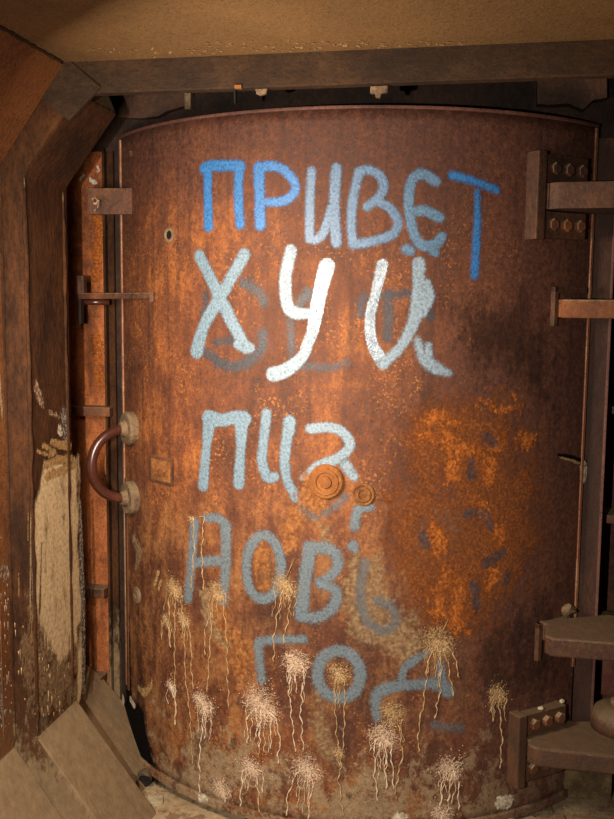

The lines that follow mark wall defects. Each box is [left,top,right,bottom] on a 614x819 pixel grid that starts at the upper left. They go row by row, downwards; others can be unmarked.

corrosion [89,215,103,285]
corrosion [91,329,105,389]
corrosion [281,469,344,555]
corrosion [380,386,550,640]
peeling [20,456,83,716]
corrosion [253,540,270,590]
corrosion [199,587,258,693]
damp [494,794,514,810]